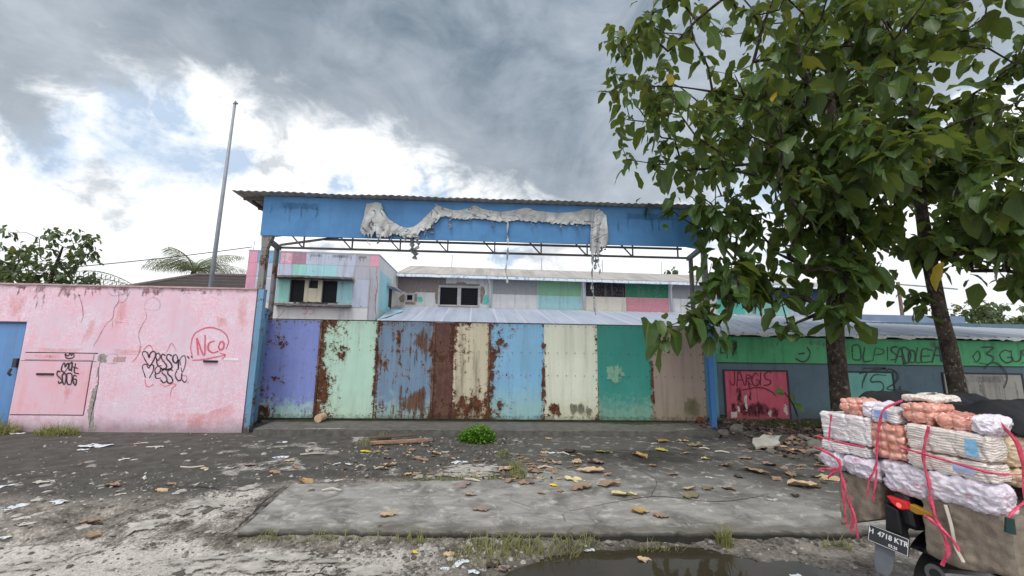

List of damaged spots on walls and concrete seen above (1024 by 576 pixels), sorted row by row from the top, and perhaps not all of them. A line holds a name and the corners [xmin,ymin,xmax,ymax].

rust [317,335,348,409]
rust [372,321,380,411]
rust [392,385,426,414]
rust [414,326,427,364]
rust [453,371,503,416]
rust [541,343,592,417]
peeling [606,365,624,383]